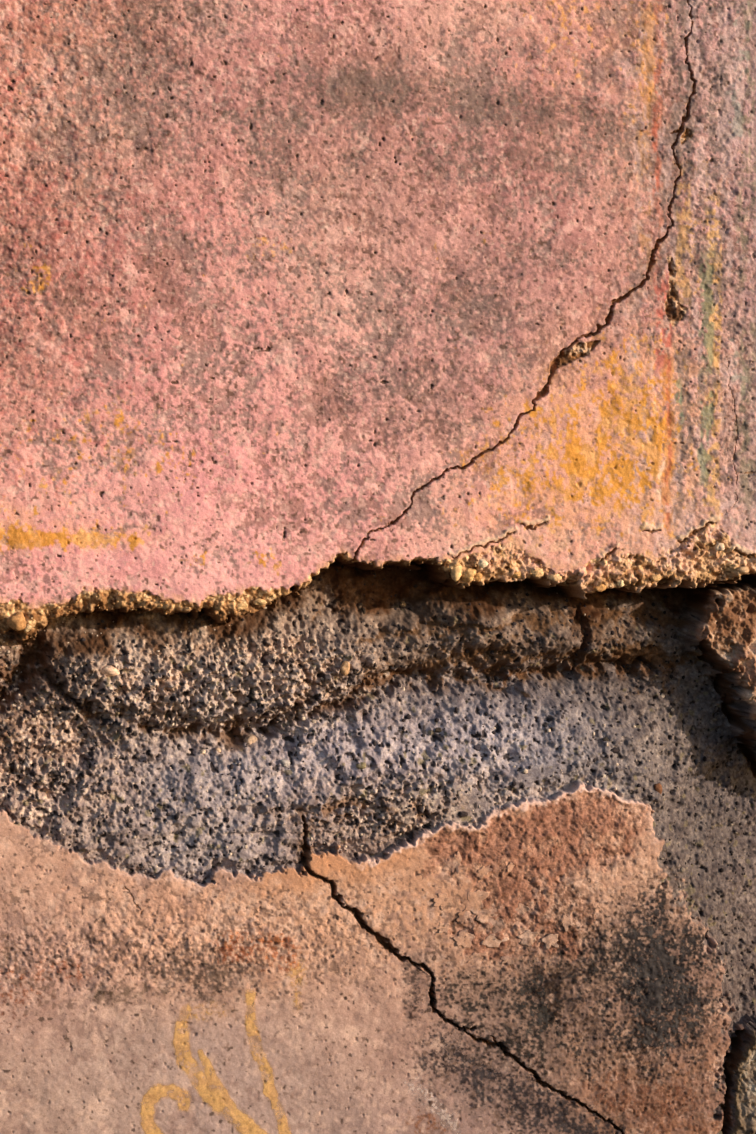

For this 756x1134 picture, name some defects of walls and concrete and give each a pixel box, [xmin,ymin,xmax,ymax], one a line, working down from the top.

crack [354,0,697,557]
spalling [0,521,756,1134]
crack [300,815,625,1134]